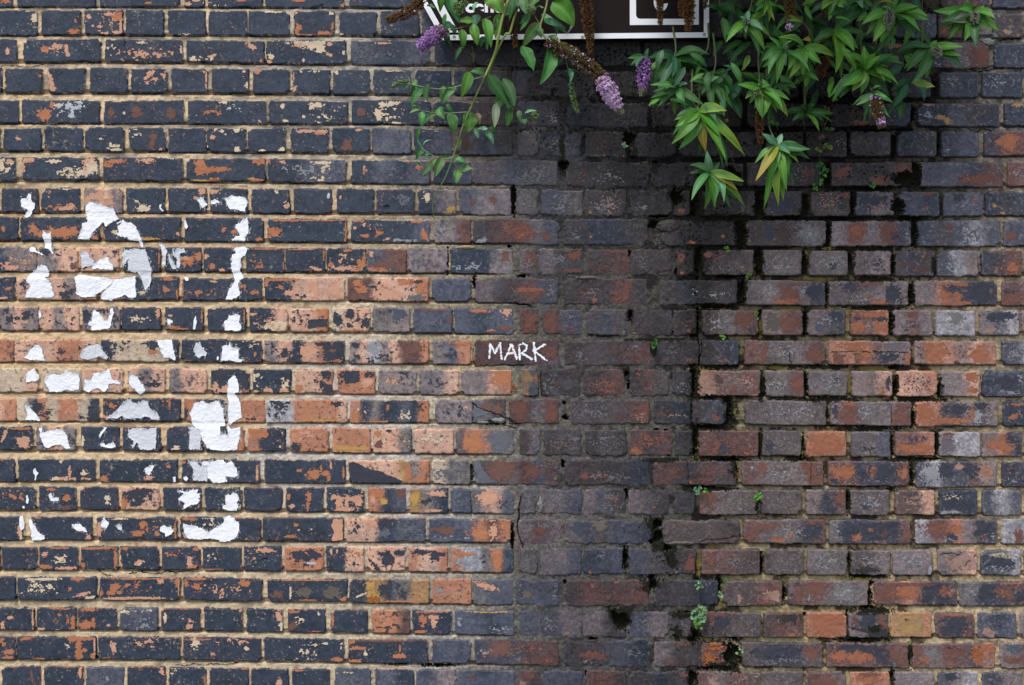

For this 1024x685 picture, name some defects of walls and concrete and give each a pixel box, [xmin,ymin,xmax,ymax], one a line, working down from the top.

peeling [22,217,80,239]
water stain [504,11,924,433]
spalling [0,249,35,299]
peeling [158,249,225,300]
spalling [0,427,38,449]
peeling [351,405,410,448]
peeling [46,465,108,502]
crack [515,496,523,548]
peeling [330,640,371,663]